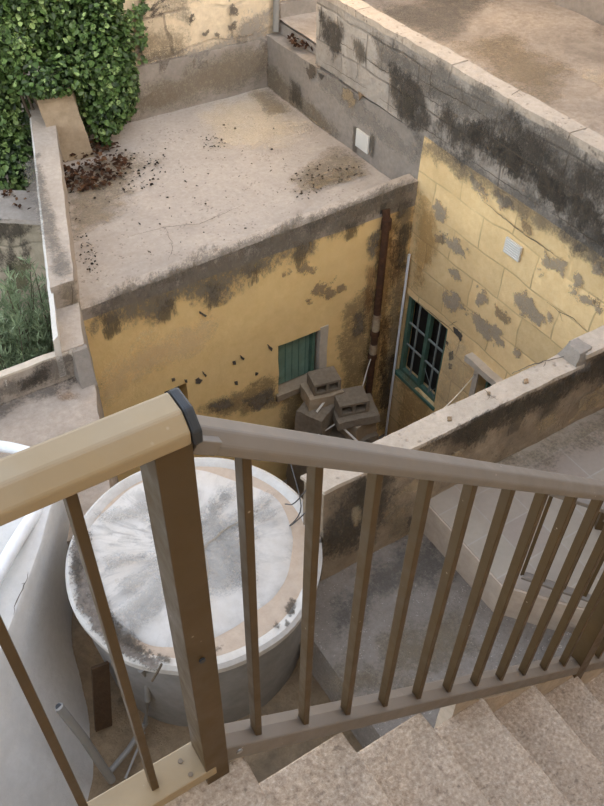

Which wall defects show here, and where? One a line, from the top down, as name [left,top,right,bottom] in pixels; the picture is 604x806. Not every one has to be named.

leakage [318,9,366,62]
leakage [68,156,140,234]
leakage [294,127,374,190]
leakage [372,35,604,269]
leakage [91,178,415,430]
leakage [69,556,83,586]
leakage [201,487,242,588]
leakage [111,572,170,662]
leakage [273,598,296,629]